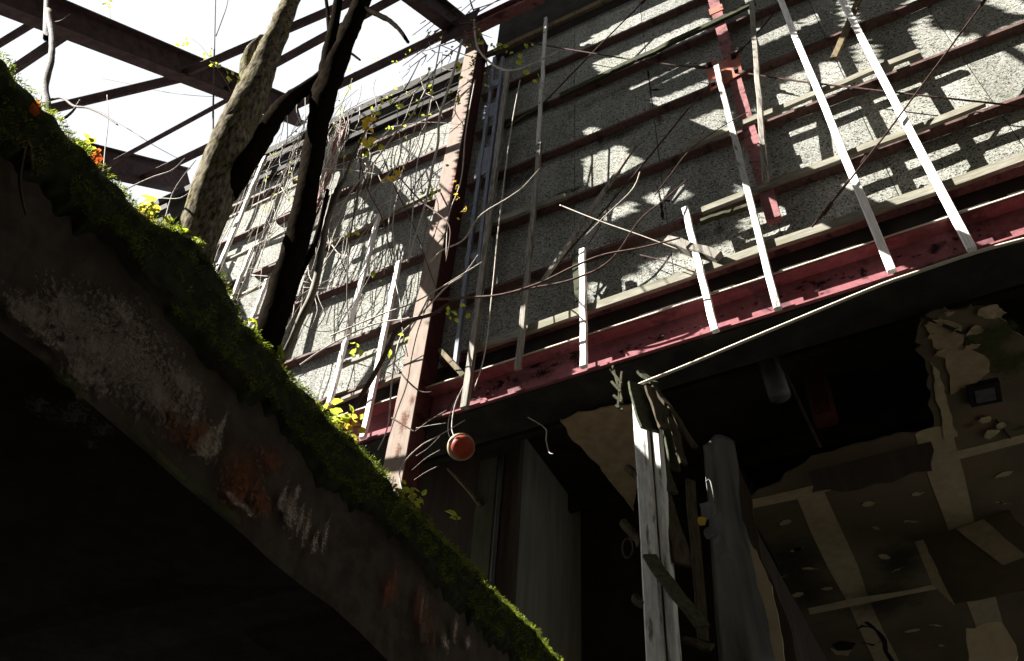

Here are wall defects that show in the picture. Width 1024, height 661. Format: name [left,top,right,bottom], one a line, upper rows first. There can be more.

flaking render [925,304,1007,440]
water stain [277,481,329,553]